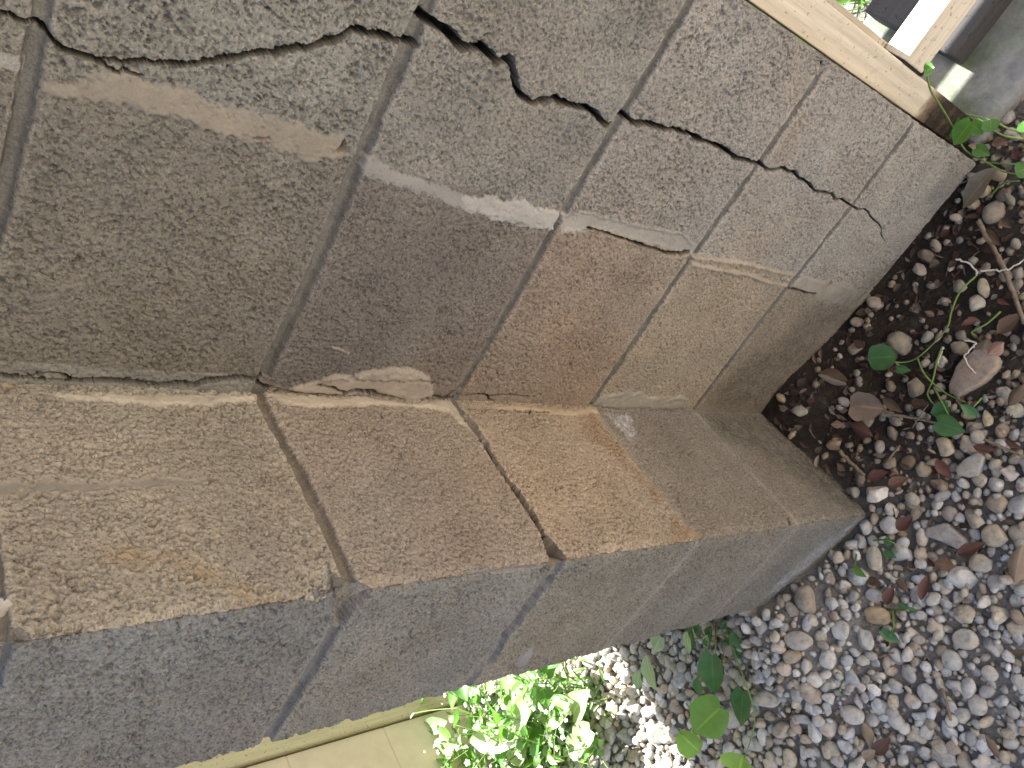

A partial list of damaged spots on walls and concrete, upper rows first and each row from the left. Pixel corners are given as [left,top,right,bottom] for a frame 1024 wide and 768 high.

crack [0,0,886,242]